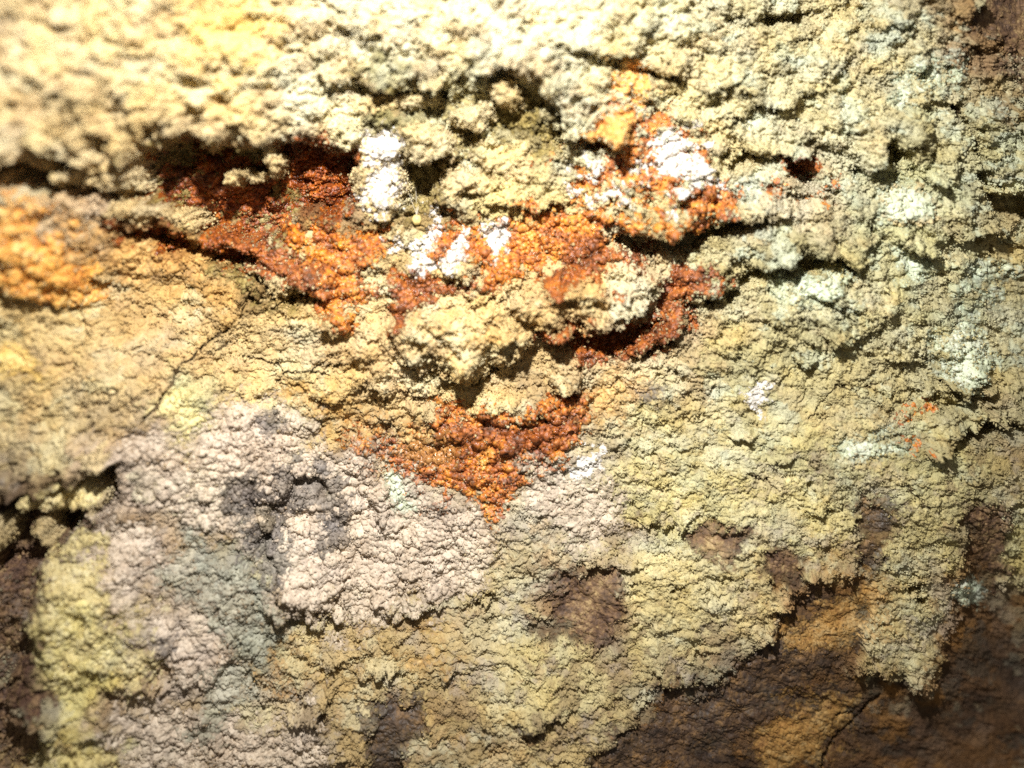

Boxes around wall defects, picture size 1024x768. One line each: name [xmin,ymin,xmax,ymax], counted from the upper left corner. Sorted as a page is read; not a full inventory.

leakage [343,67,372,97]
leakage [350,74,728,280]
rust [0,42,746,534]
efflorescence [16,385,515,768]
leakage [950,575,988,607]